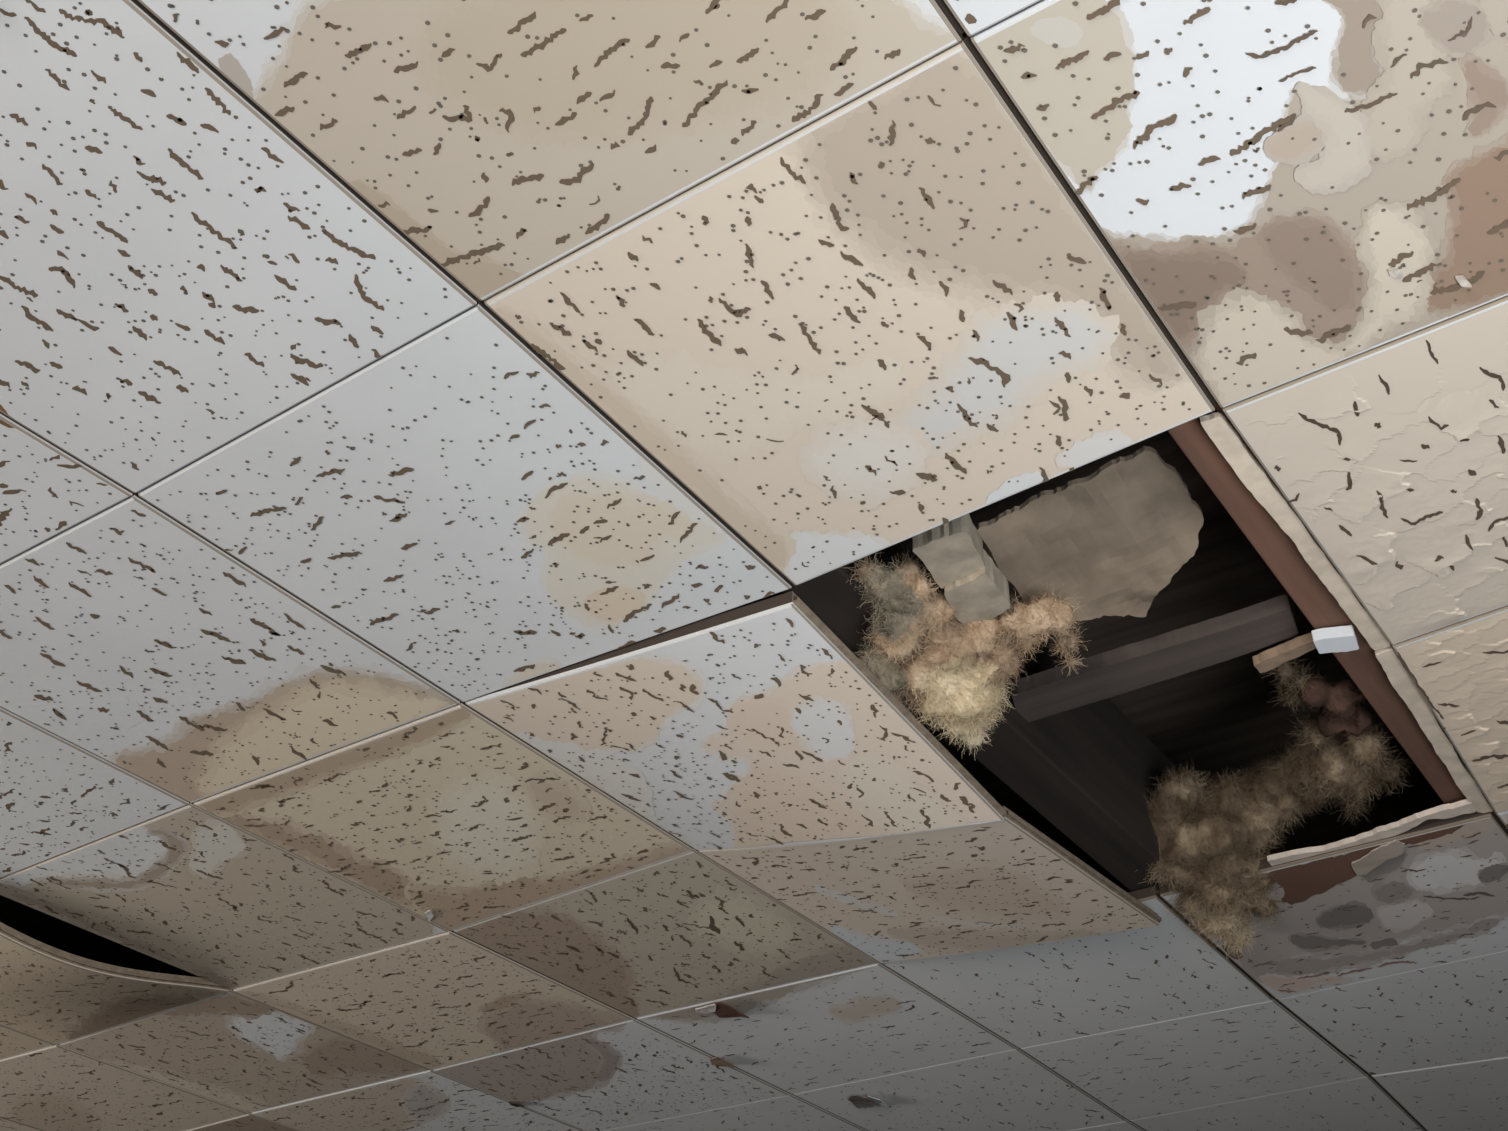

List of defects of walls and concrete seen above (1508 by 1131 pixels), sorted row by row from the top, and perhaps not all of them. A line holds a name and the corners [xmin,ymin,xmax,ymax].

damp [218,0,1508,637]
crack [1426,340,1439,364]
peeling [986,429,1133,504]
crack [1261,367,1508,571]
peeling [784,529,891,584]
crack [1398,652,1508,788]
crack [1483,648,1508,656]
damp [0,653,1157,1131]
spalling [1268,824,1466,905]
damp [1230,813,1508,994]